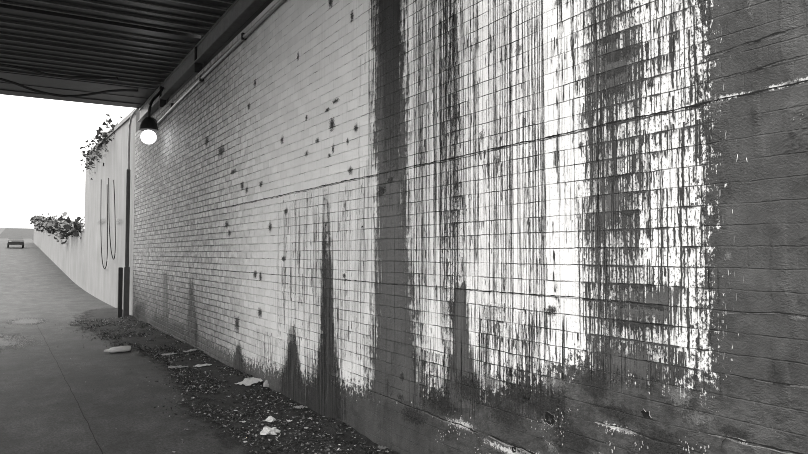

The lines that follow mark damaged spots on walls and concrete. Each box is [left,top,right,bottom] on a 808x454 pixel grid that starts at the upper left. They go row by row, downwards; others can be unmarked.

crack [704,24,808,58]
crack [194,54,808,215]
damp [256,0,753,454]